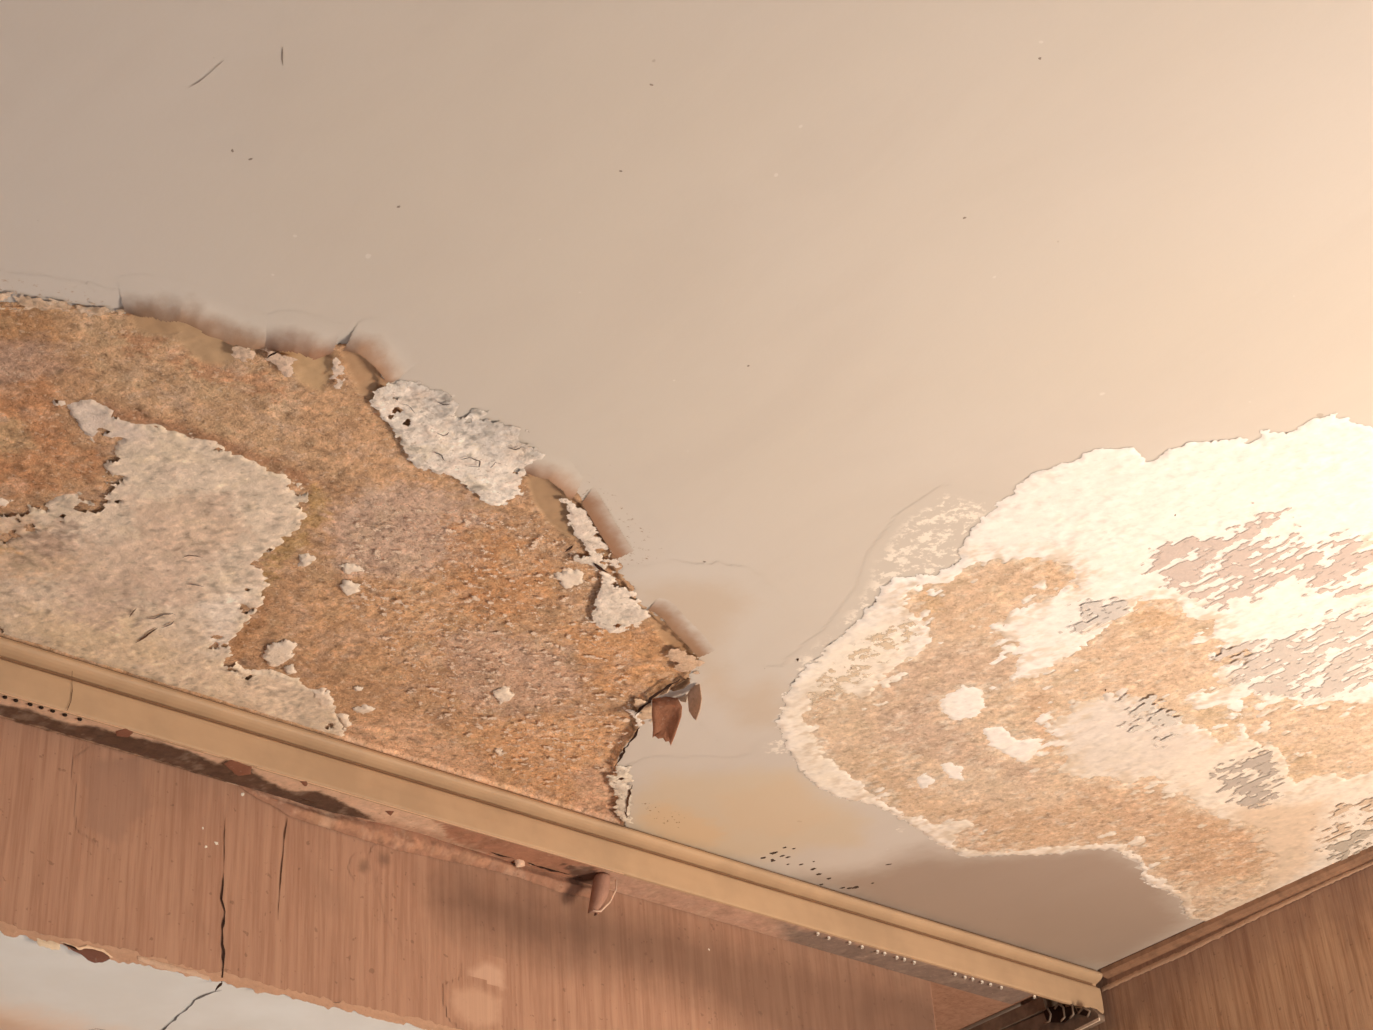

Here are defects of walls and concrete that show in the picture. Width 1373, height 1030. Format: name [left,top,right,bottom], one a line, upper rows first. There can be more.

crack [162,830,225,1030]
crack [278,822,287,913]
flaking render [0,269,716,826]
peeling [753,413,1373,992]